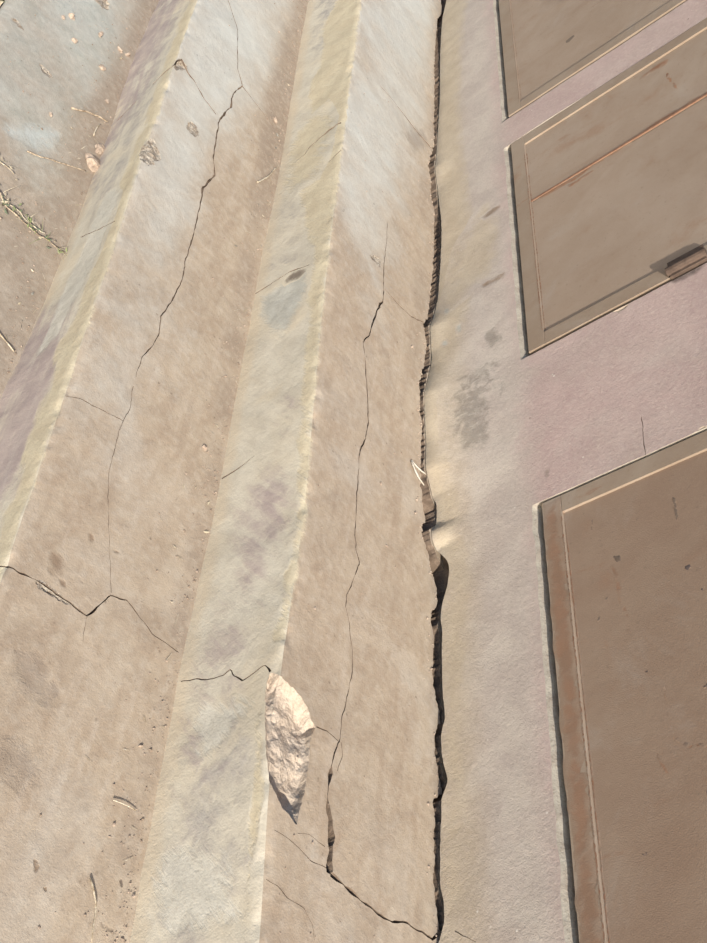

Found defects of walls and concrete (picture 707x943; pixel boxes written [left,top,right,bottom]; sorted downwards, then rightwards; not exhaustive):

crack [0,1,273,653]
crack [275,0,476,942]
crack [181,665,271,682]
spalling [244,673,315,886]
crack [266,879,315,941]